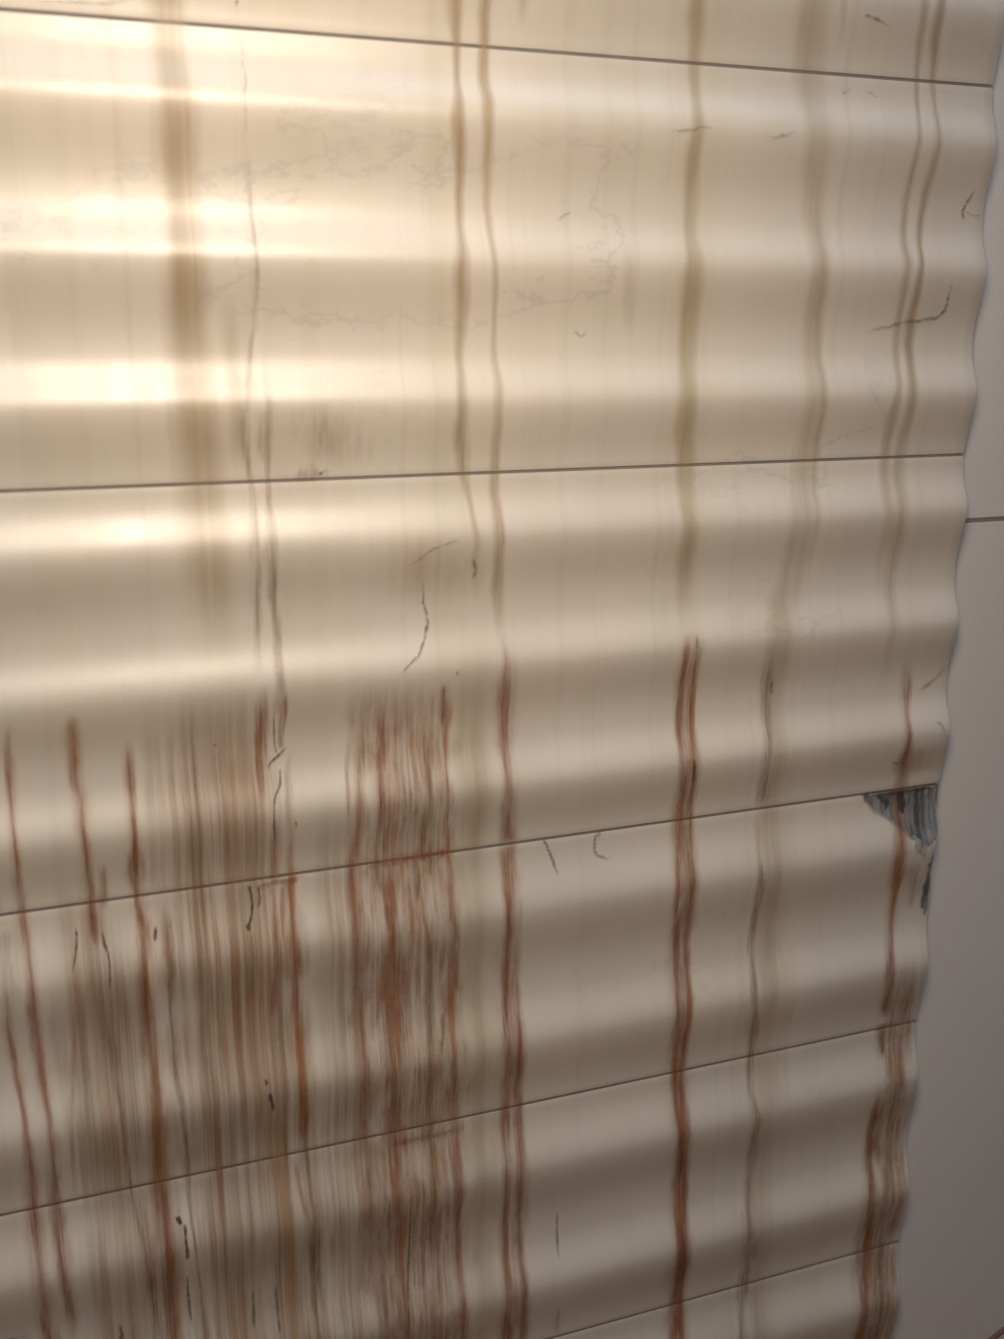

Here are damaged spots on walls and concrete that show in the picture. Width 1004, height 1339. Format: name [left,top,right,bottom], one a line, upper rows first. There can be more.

corrosion [256,711,284,803]
corrosion [678,697,695,772]
spalling [862,783,939,913]
corrosion [136,900,173,1029]
corrosion [275,876,296,976]
corrosion [377,724,459,1339]
corrosion [857,1001,910,1339]
corrosion [167,1217,195,1313]